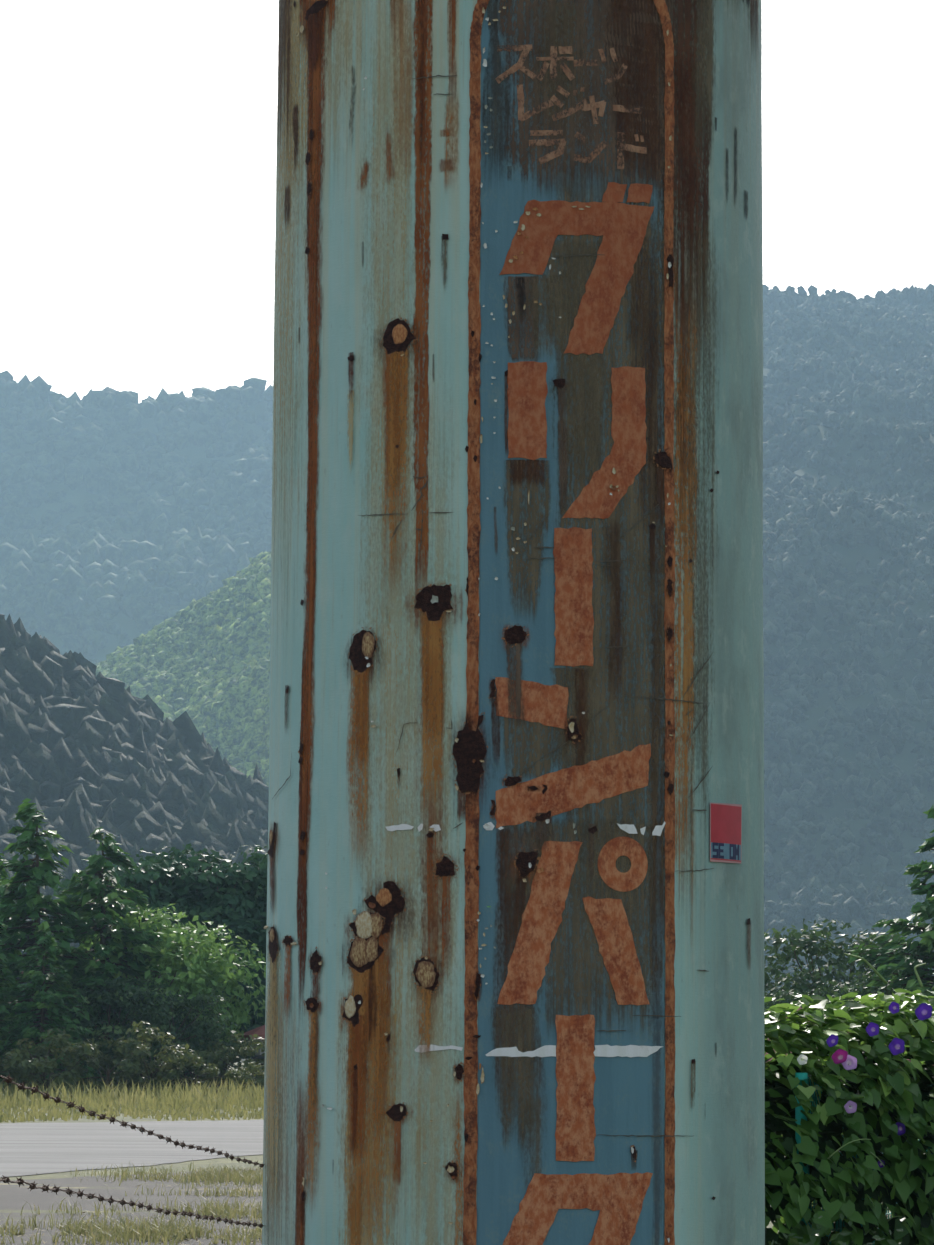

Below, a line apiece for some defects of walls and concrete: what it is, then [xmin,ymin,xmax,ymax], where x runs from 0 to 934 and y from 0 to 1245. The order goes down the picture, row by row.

rust [396,0,458,627]
rust [277,0,335,1010]
rust [652,0,711,887]
peeling [386,824,441,832]
rust [421,804,443,966]
peeling [593,1045,663,1057]
rust [295,1094,307,1245]
rust [348,1179,360,1245]
rust [448,1108,463,1245]